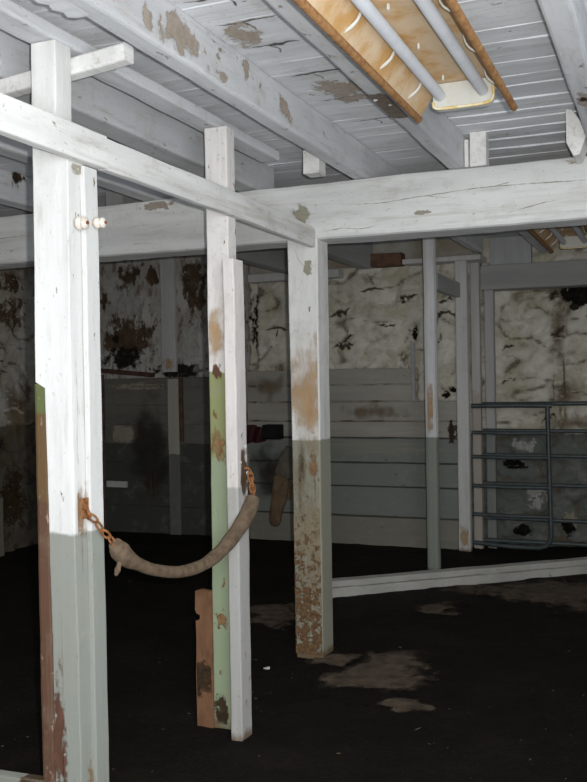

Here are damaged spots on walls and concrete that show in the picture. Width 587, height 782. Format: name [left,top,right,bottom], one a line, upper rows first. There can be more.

peeling [142,4,206,57]
peeling [222,22,263,48]
peeling [0,272,26,331]
peeling [116,263,160,291]
peeling [179,263,207,326]
spalling [560,287,587,311]
peeling [100,293,158,369]
rust [209,313,222,353]
rust [291,363,318,428]
rust [210,431,225,461]
rust [293,455,322,656]